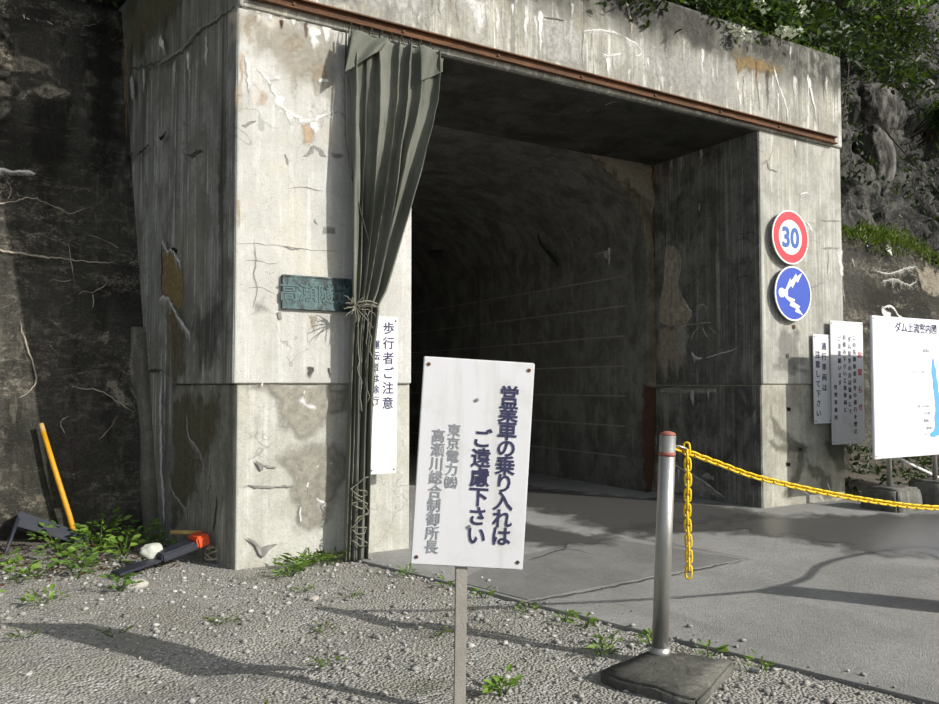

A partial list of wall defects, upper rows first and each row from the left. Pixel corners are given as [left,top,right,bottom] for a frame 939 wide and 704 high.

damp [0,22,70,100]
damp [84,23,145,142]
crack [129,6,234,71]
crack [127,131,166,160]
crack [186,149,203,167]
spalling [304,145,341,157]
crack [53,279,107,308]
spalling [161,238,184,310]
rust [642,385,657,492]
damp [771,418,851,502]
damp [524,485,657,546]
damp [673,462,939,558]